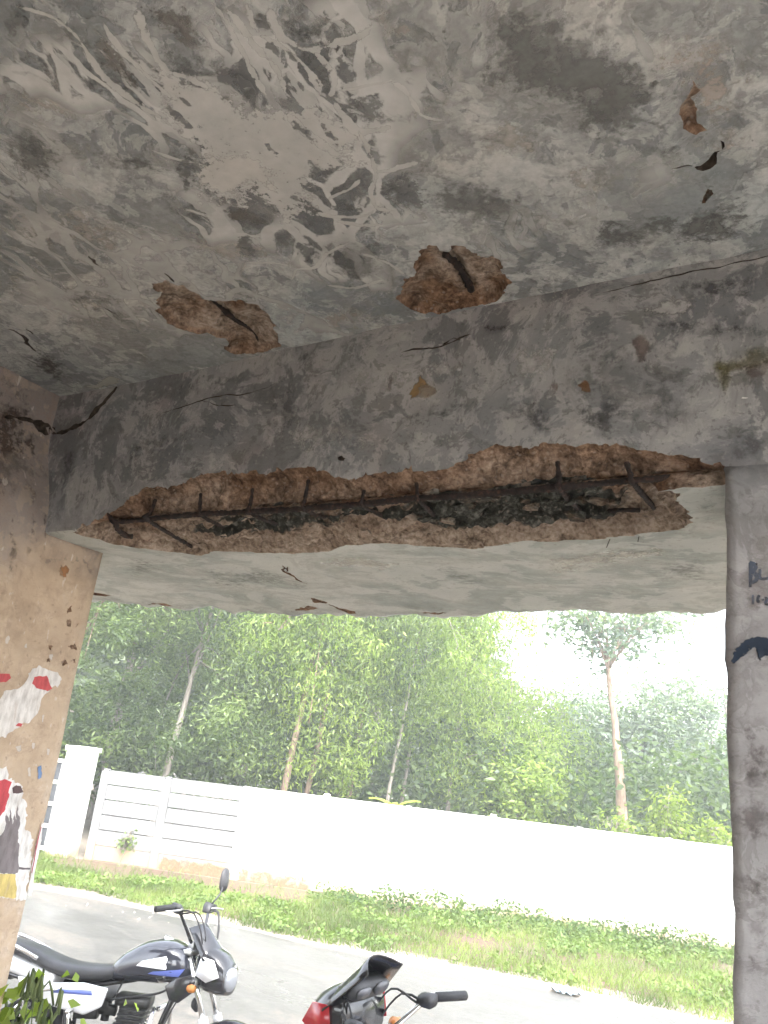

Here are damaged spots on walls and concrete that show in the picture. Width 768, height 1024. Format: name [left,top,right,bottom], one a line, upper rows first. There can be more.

leakage [483,12,657,139]
spalling [679,80,706,135]
leakage [0,0,445,337]
leakage [436,178,551,259]
leakage [596,208,747,244]
spalling [152,273,281,354]
spalling [396,245,512,315]
crack [604,256,767,293]
crack [2,386,117,436]
crack [160,384,273,414]
spalling [73,442,725,556]
spalling [47,644,77,666]